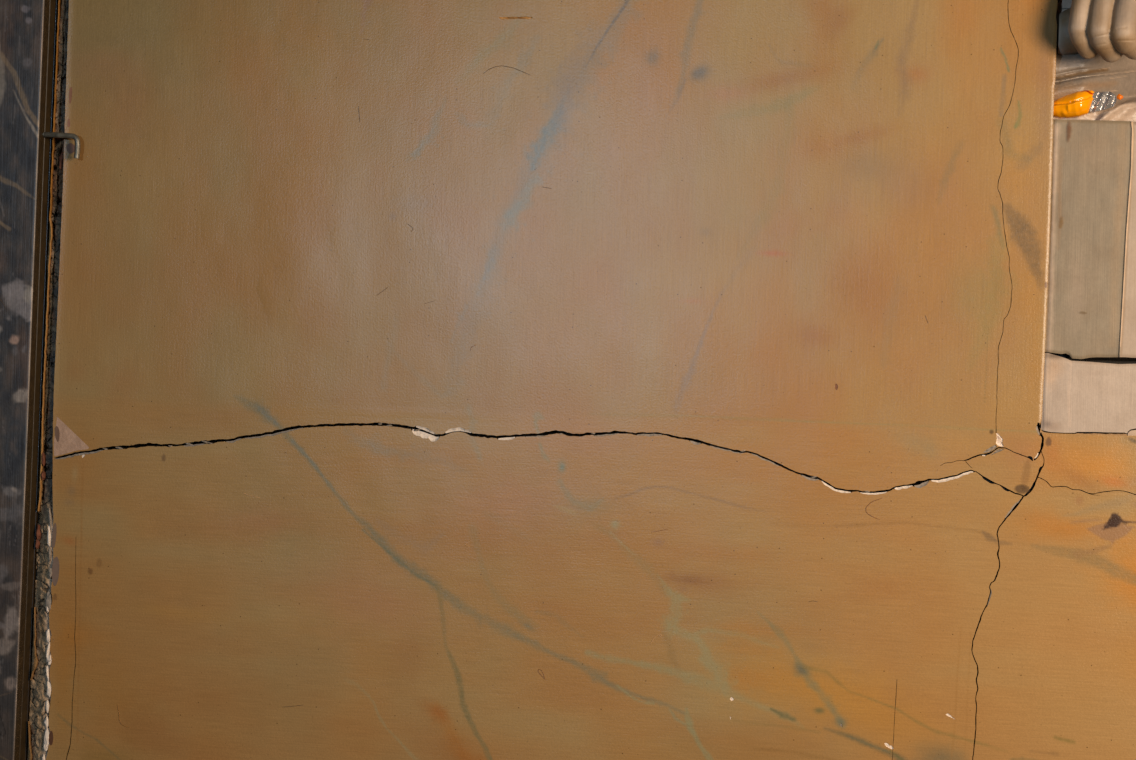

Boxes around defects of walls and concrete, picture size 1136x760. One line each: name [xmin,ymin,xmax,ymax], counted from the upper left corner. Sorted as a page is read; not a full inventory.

crack [997,0,1019,380]
crack [1068,356,1136,364]
crack [55,408,1136,760]